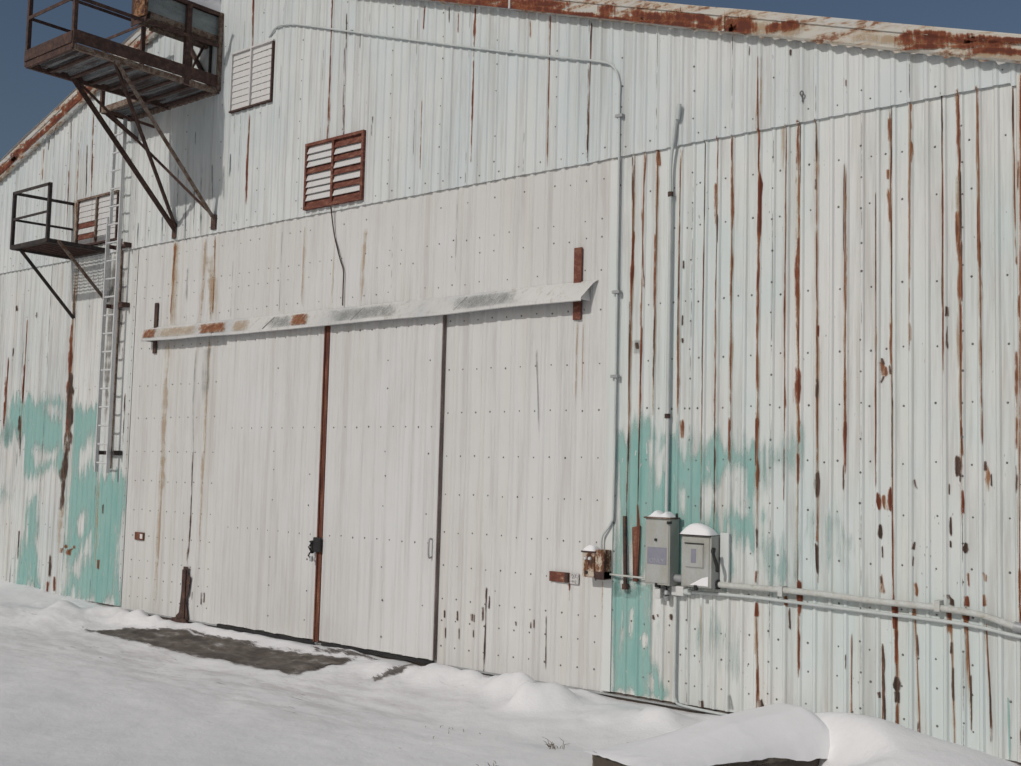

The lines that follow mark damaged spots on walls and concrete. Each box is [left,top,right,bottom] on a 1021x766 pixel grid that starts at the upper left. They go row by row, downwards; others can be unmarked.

peeling [0,393,126,606]
rust [59,274,78,528]
peeling [612,418,803,700]
rust [755,56,763,492]
rust [754,602,764,707]
rust [783,120,801,442]
rust [784,540,803,674]
rust [875,109,901,724]
rust [947,573,972,741]
rust [955,89,965,516]
rust [975,87,983,444]
rust [1012,75,1021,229]